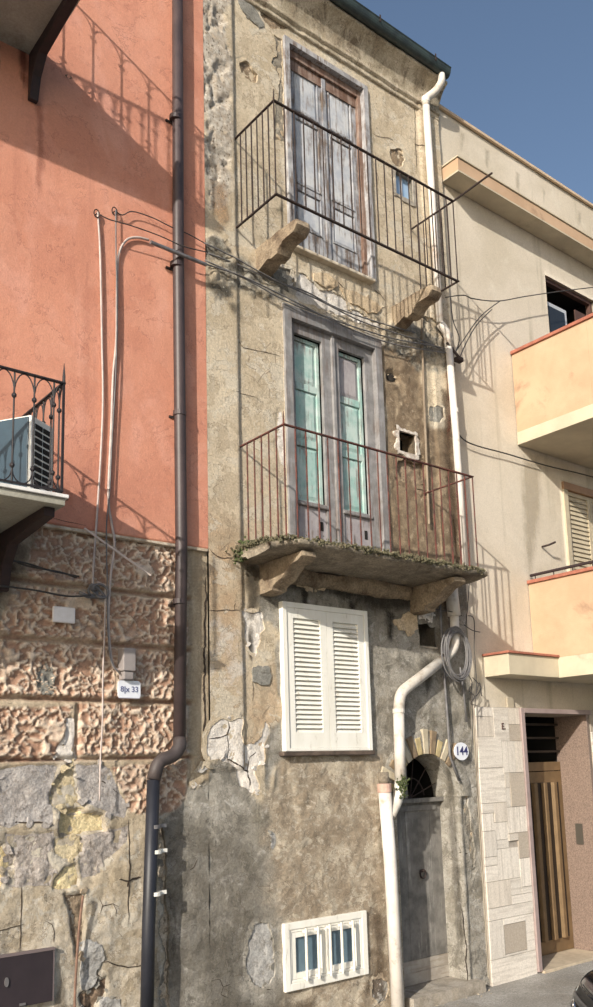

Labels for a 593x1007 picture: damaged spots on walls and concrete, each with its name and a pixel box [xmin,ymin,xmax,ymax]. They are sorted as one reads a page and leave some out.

flaking render [269,264,384,333]
flaking render [393,607,437,637]
crack [203,578,256,787]
flaking render [189,713,275,798]
spalling [0,718,130,962]
crack [99,820,141,923]
crack [77,961,141,998]
spalling [241,916,280,995]